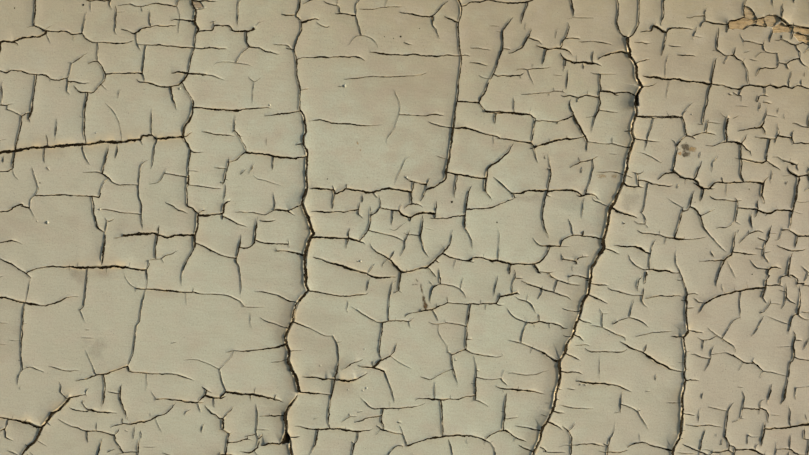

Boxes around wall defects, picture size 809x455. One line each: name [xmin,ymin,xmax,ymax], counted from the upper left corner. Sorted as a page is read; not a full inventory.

crack [400,1,448,37]
peeling [729,6,809,45]
crack [313,118,372,126]
crack [132,162,144,219]
crack [710,158,809,241]
crack [615,192,725,289]
crack [0,284,77,385]
crack [78,334,150,405]
crack [359,277,536,398]
crack [0,382,112,455]
crack [60,359,282,455]
crack [296,407,372,455]